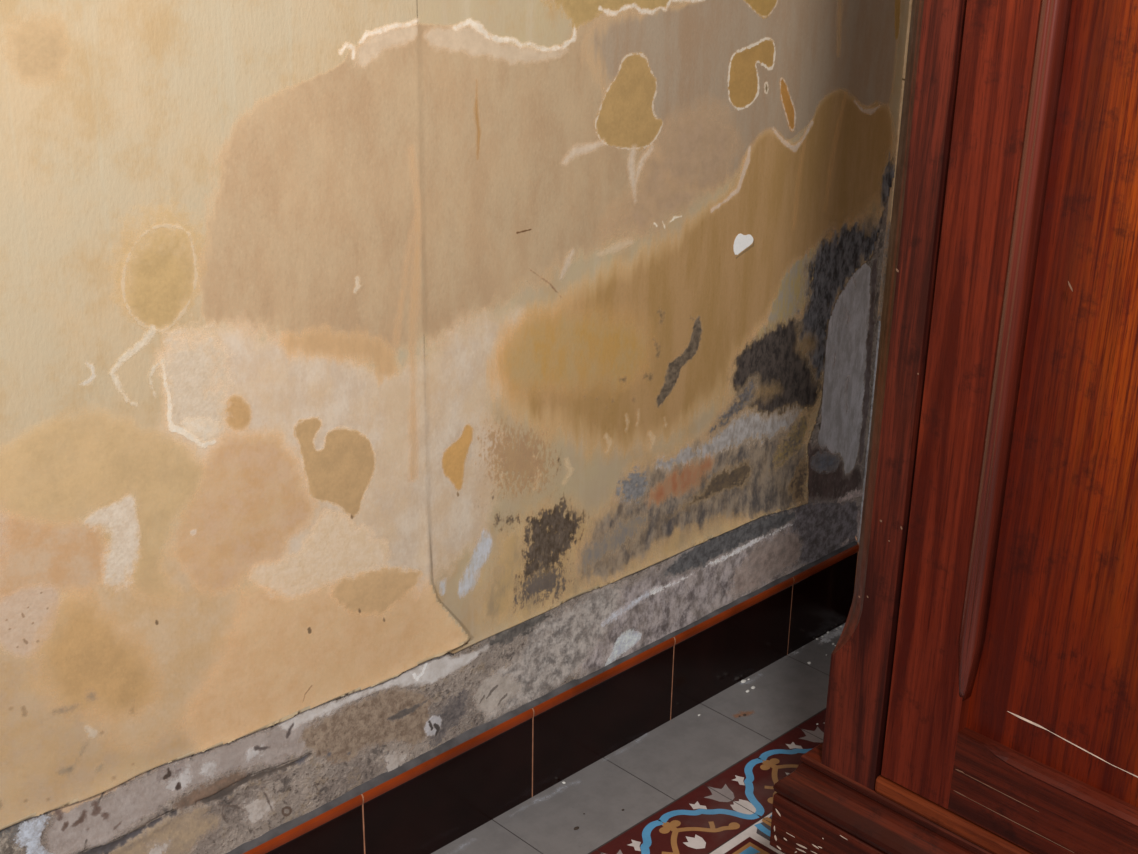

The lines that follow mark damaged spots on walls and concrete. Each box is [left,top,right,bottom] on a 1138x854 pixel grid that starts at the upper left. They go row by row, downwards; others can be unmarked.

peeling [733,234,754,258]
flaking render [818,263,876,474]
leakage [0,0,900,854]
flaking render [280,647,489,739]
spalling [474,674,521,714]
spalling [163,757,217,791]
spalling [246,744,270,762]
spalling [384,751,407,772]
flaking render [0,801,120,854]
spalling [242,798,292,824]